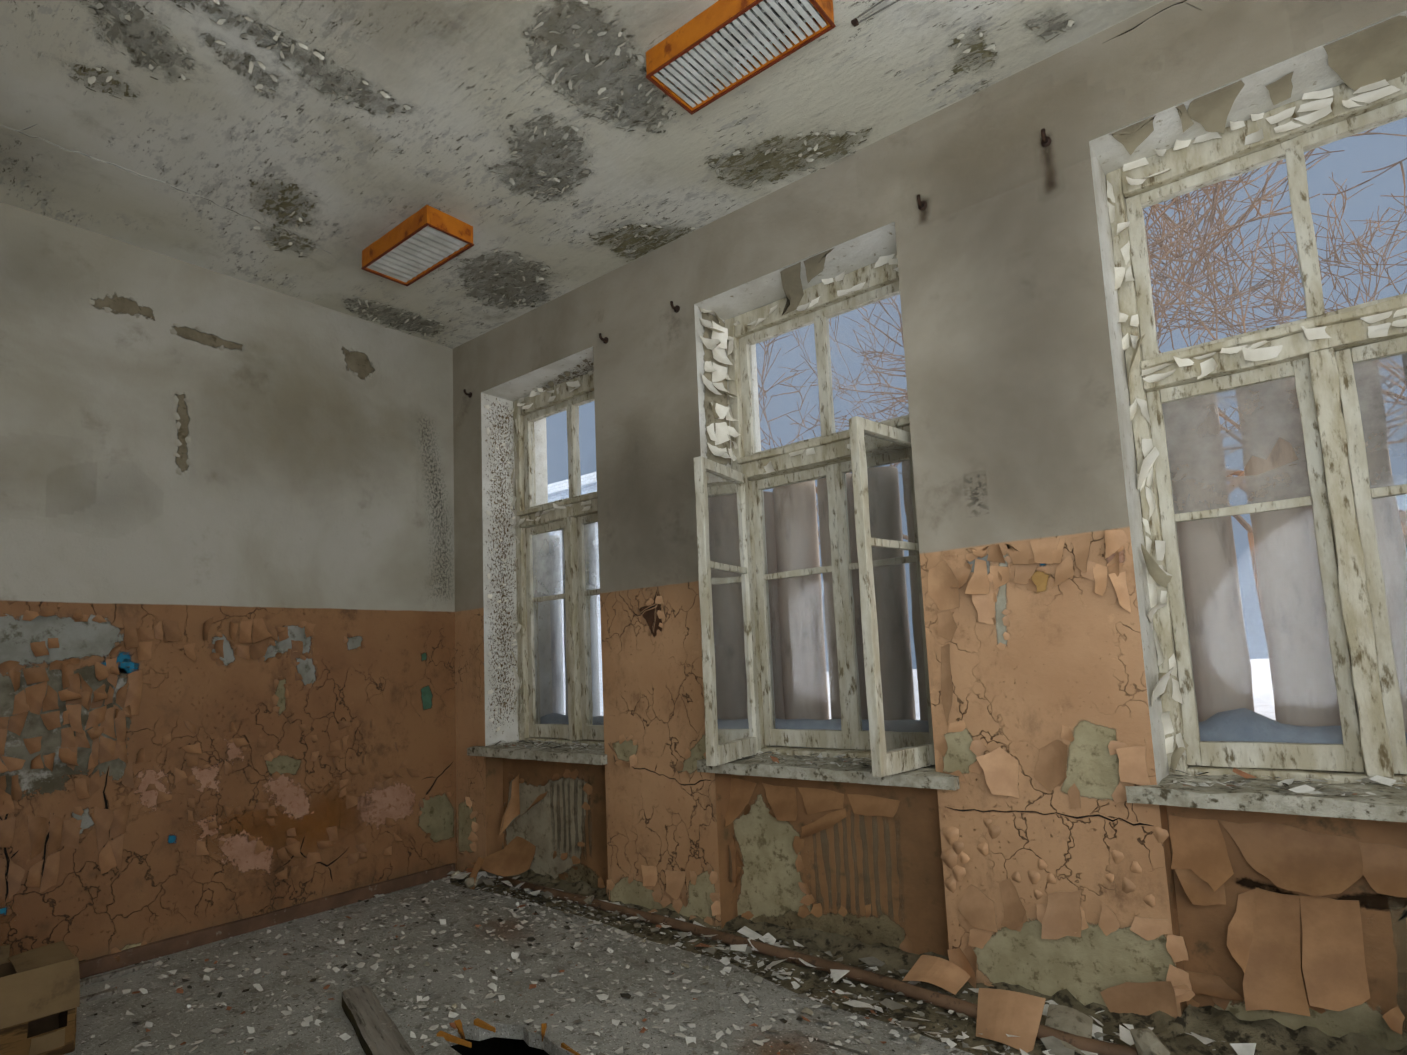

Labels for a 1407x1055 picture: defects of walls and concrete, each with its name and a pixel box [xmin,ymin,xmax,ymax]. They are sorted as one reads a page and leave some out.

crack [1102,0,1201,44]
peeling [1107,15,1407,290]
peeling [88,294,155,321]
peeling [170,323,246,351]
peeling [699,248,898,469]
peeling [1360,308,1407,338]
peeling [484,359,638,768]
peeling [913,312,1406,809]
crack [0,800,54,903]
crack [102,766,110,848]
peeling [471,769,593,880]
peeling [606,778,901,925]